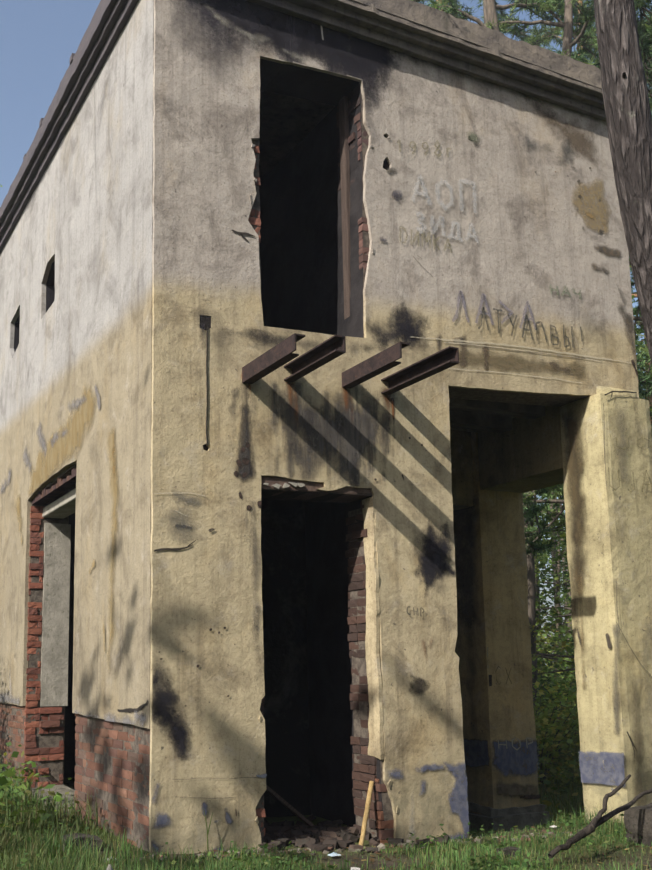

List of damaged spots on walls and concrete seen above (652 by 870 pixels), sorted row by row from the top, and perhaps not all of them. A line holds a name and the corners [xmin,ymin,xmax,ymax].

damp [179,0,392,83]
spalling [248,143,261,243]
crack [232,230,255,241]
damp [371,308,418,343]
damp [234,383,256,481]
damp [272,383,390,484]
crack [154,540,196,552]
spalling [375,770,402,843]
peeling [418,739,541,839]
peeling [579,751,625,790]